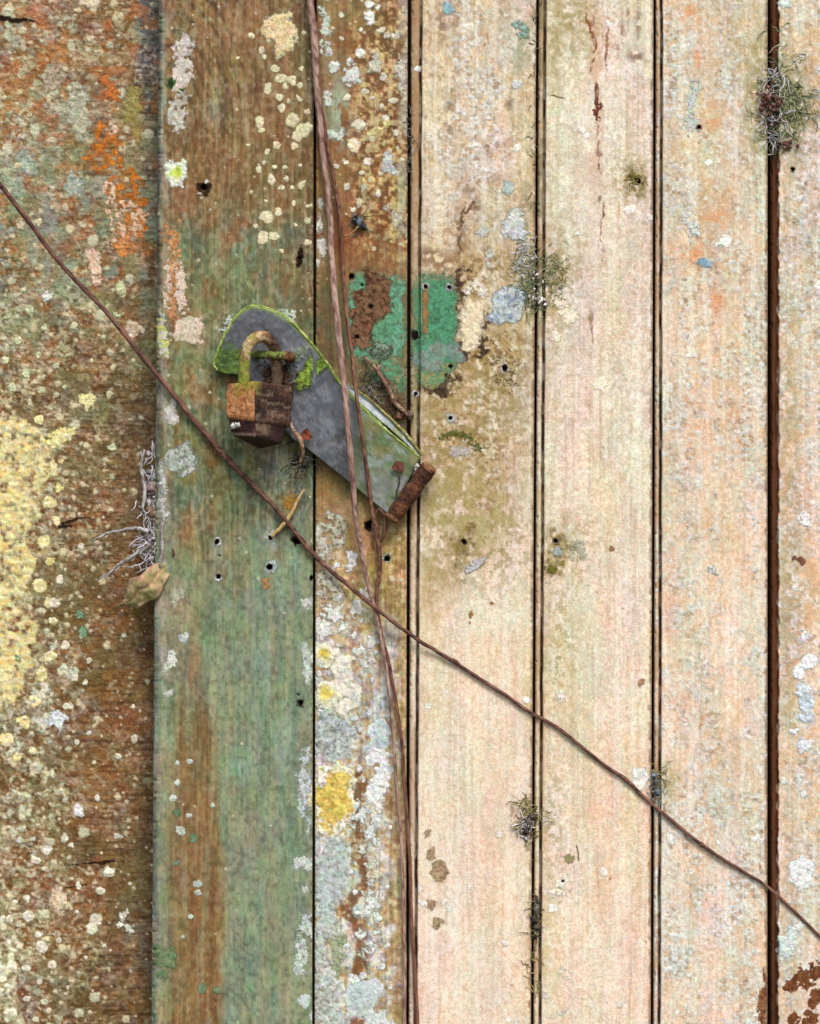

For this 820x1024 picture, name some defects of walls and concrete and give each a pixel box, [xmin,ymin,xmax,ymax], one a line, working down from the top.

peeling [346,266,465,396]